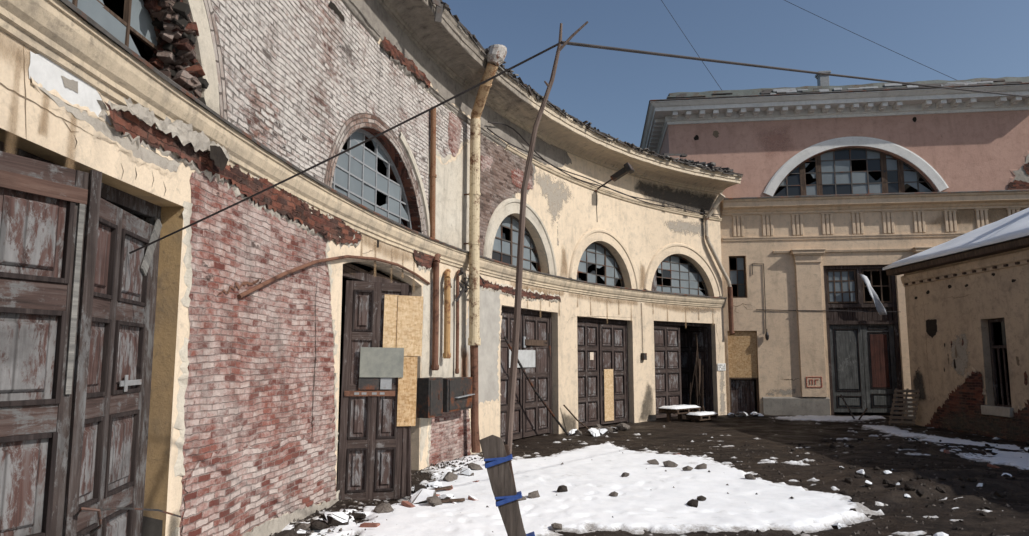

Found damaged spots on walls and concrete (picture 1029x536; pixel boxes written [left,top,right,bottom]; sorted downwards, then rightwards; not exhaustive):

crack [0,44,100,148]
spalling [143,0,209,105]
flaking render [211,0,572,256]
spalling [1007,150,1029,190]
flaking render [29,51,362,536]
peeling [412,249,561,467]
flaking render [925,318,1029,442]